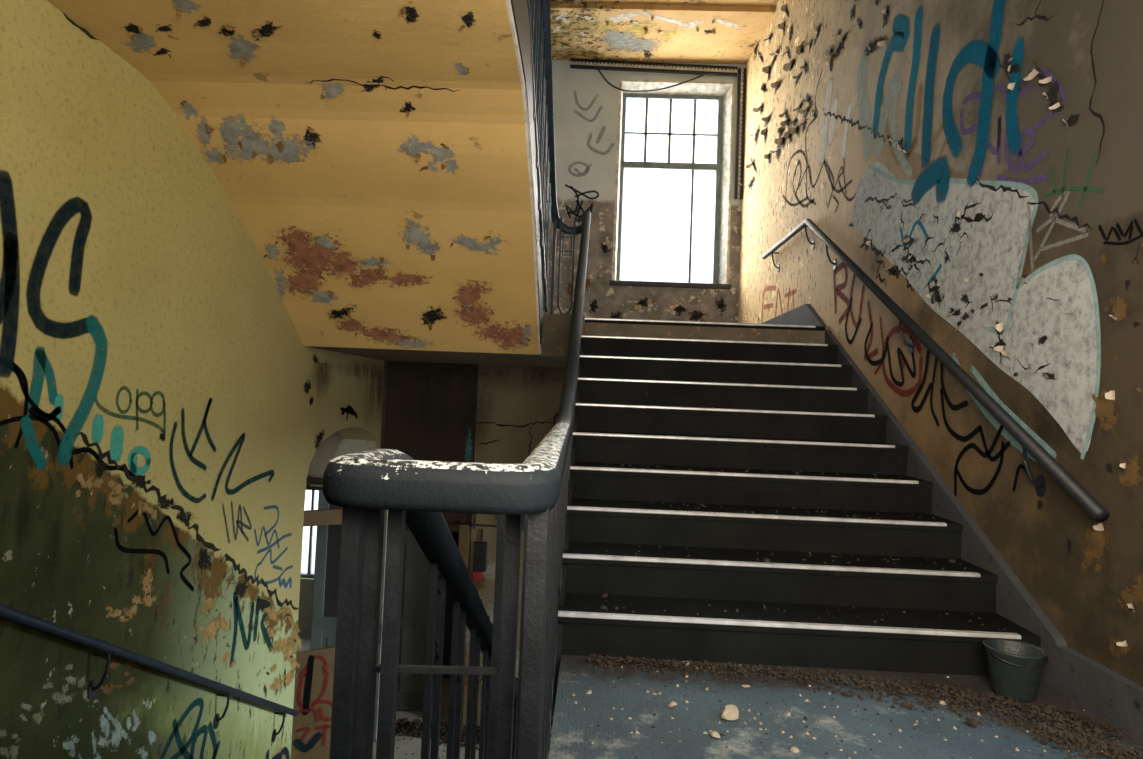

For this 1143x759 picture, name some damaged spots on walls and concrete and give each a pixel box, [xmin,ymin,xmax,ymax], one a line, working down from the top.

peeling [124,0,282,64]
peeling [401,1,422,24]
peeling [588,0,744,61]
crack [306,77,458,92]
peeling [744,0,890,189]
peeling [180,101,323,166]
peeling [397,134,459,173]
peeling [398,210,502,261]
peeling [264,226,535,354]
peeling [946,273,1012,331]
crack [477,421,551,456]
peeling [19,660,162,759]